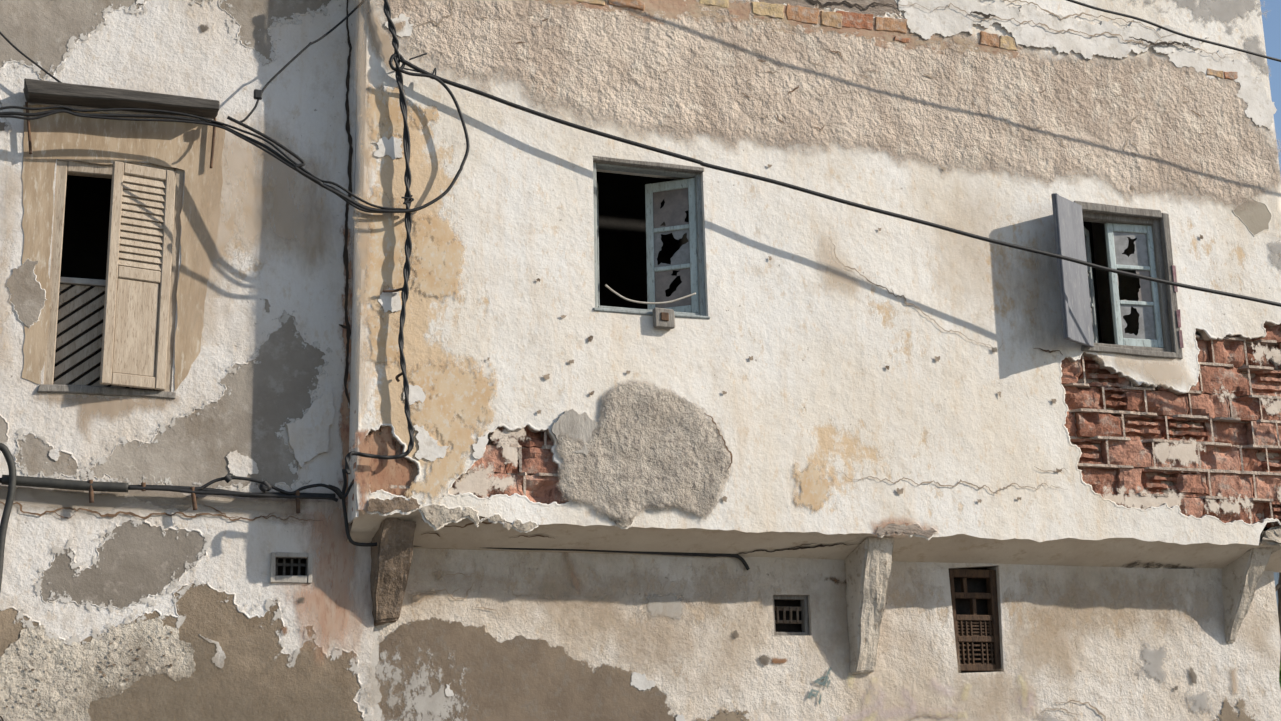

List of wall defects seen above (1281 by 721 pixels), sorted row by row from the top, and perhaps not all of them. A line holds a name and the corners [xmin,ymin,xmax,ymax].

flaking render [0,0,152,80]
flaking render [186,0,333,65]
flaking render [0,95,12,133]
flaking render [361,0,1281,237]
flaking render [5,259,47,329]
crack [829,238,1002,350]
peeling [350,187,573,533]
flaking render [1051,319,1281,554]
flaking render [0,297,382,721]
flaking render [696,708,752,721]